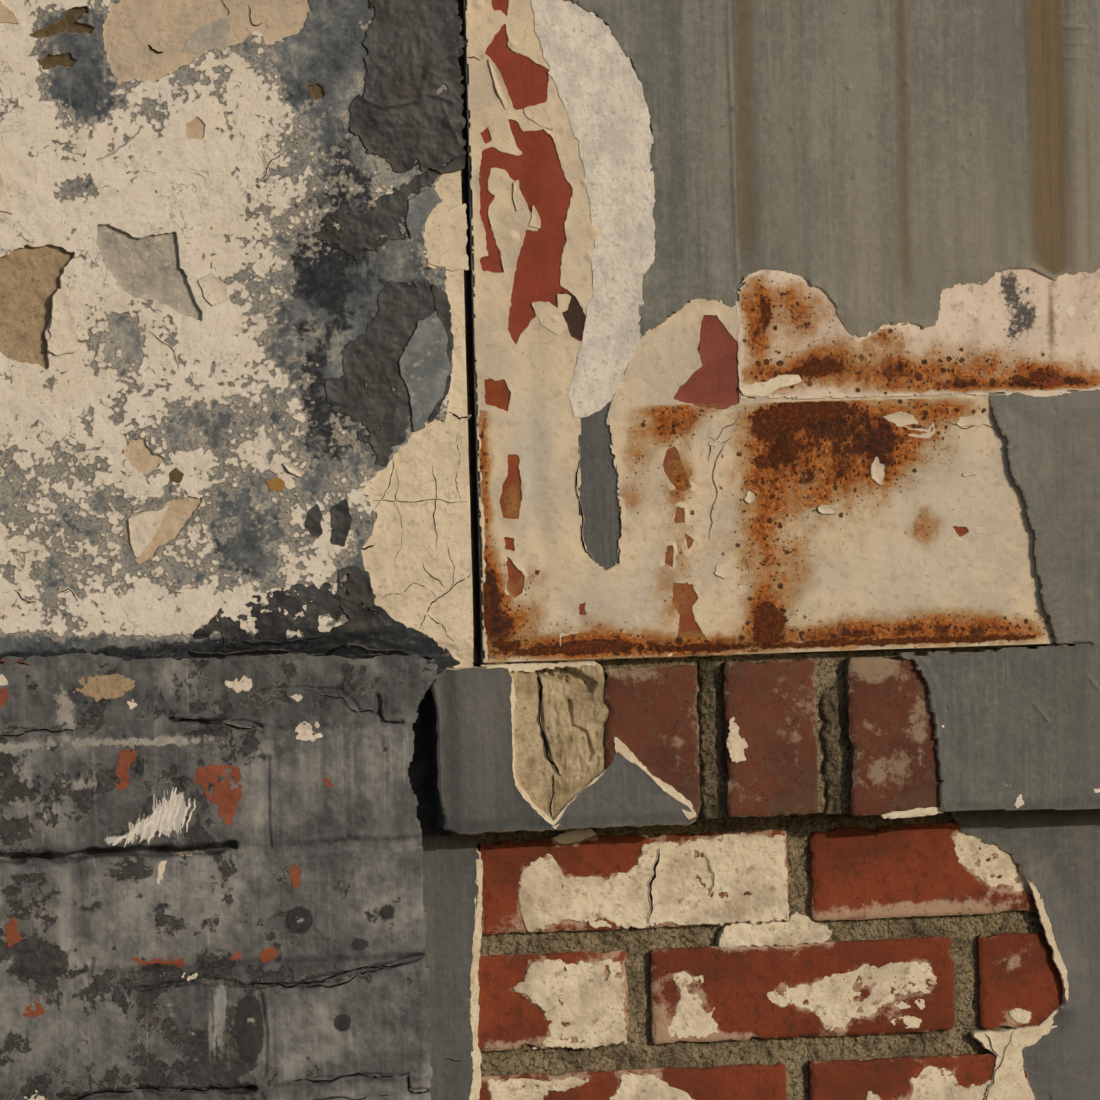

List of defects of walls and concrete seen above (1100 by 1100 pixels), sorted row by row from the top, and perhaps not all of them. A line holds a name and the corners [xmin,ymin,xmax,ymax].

rust [479,276,1100,661]